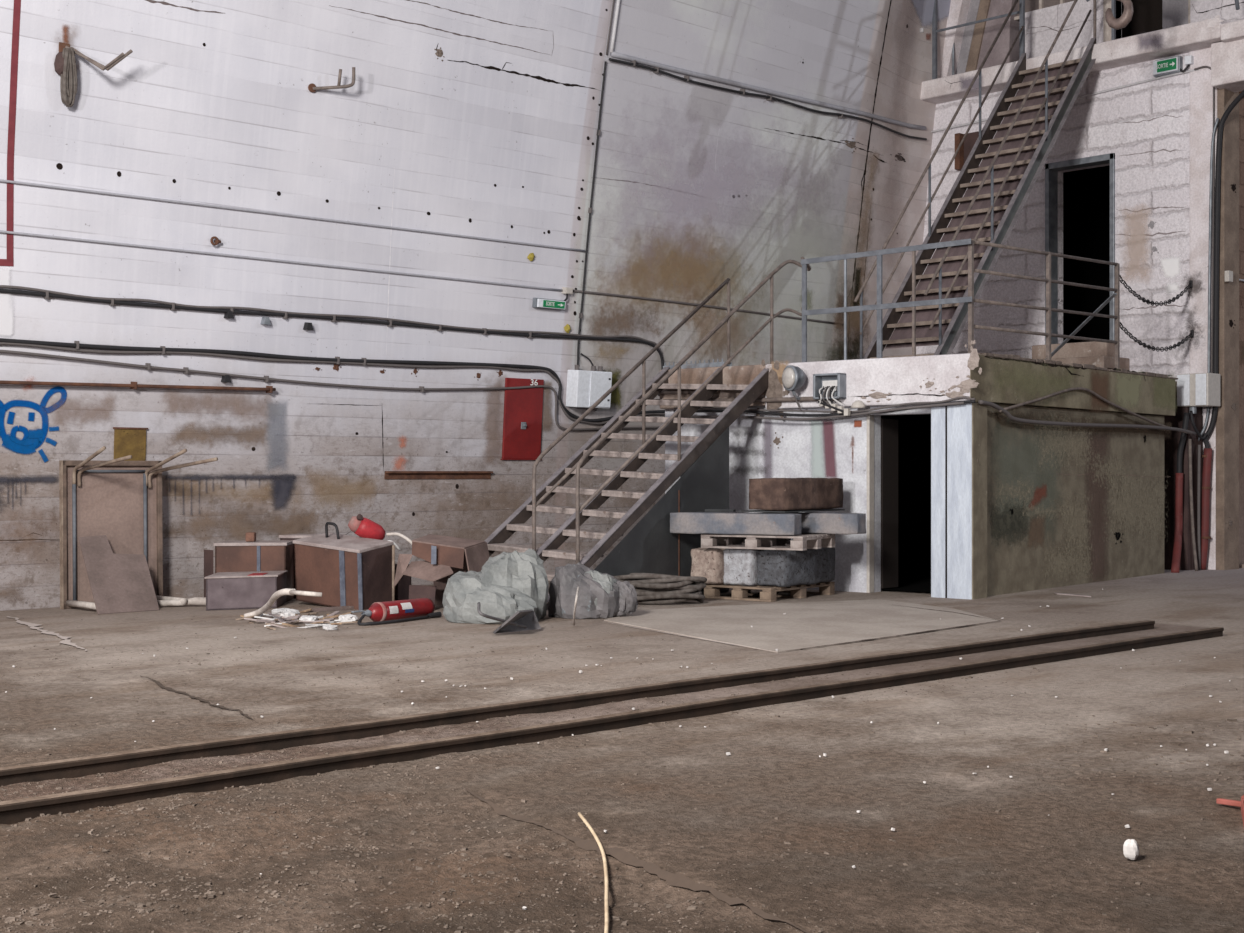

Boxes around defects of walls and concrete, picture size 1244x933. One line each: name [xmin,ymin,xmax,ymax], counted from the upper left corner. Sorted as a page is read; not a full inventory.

crack [146,0,221,13]
crack [329,0,597,90]
damp [829,268,865,361]
spalling [861,390,891,402]
damp [991,413,1171,580]
crack [6,616,87,651]